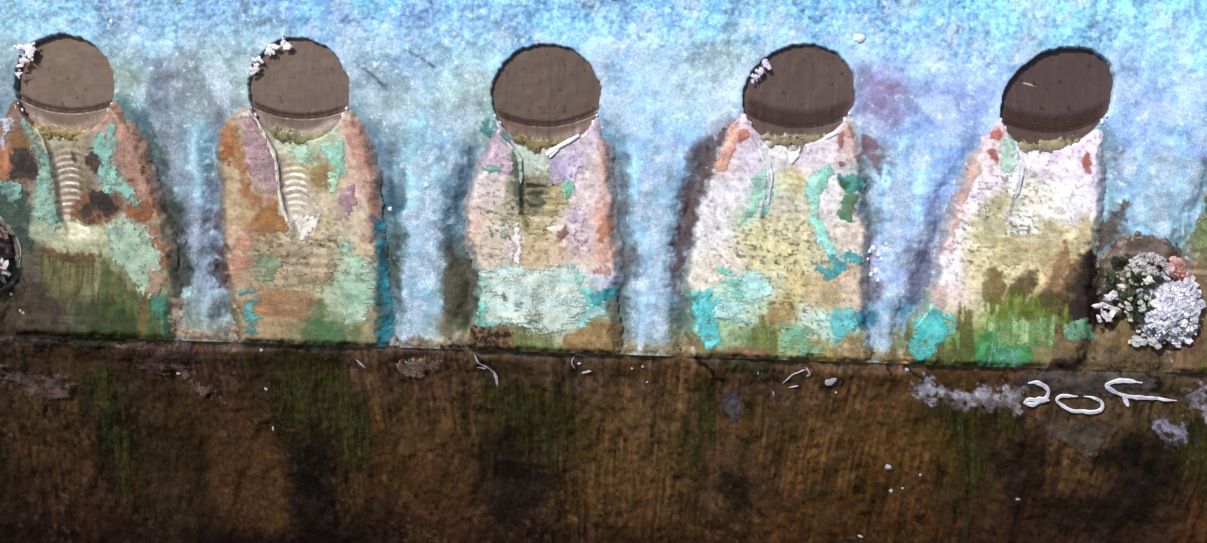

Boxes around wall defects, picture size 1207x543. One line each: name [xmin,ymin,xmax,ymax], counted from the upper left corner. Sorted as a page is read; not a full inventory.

peeling [0,257,12,283]
water stain [737,188,1207,397]